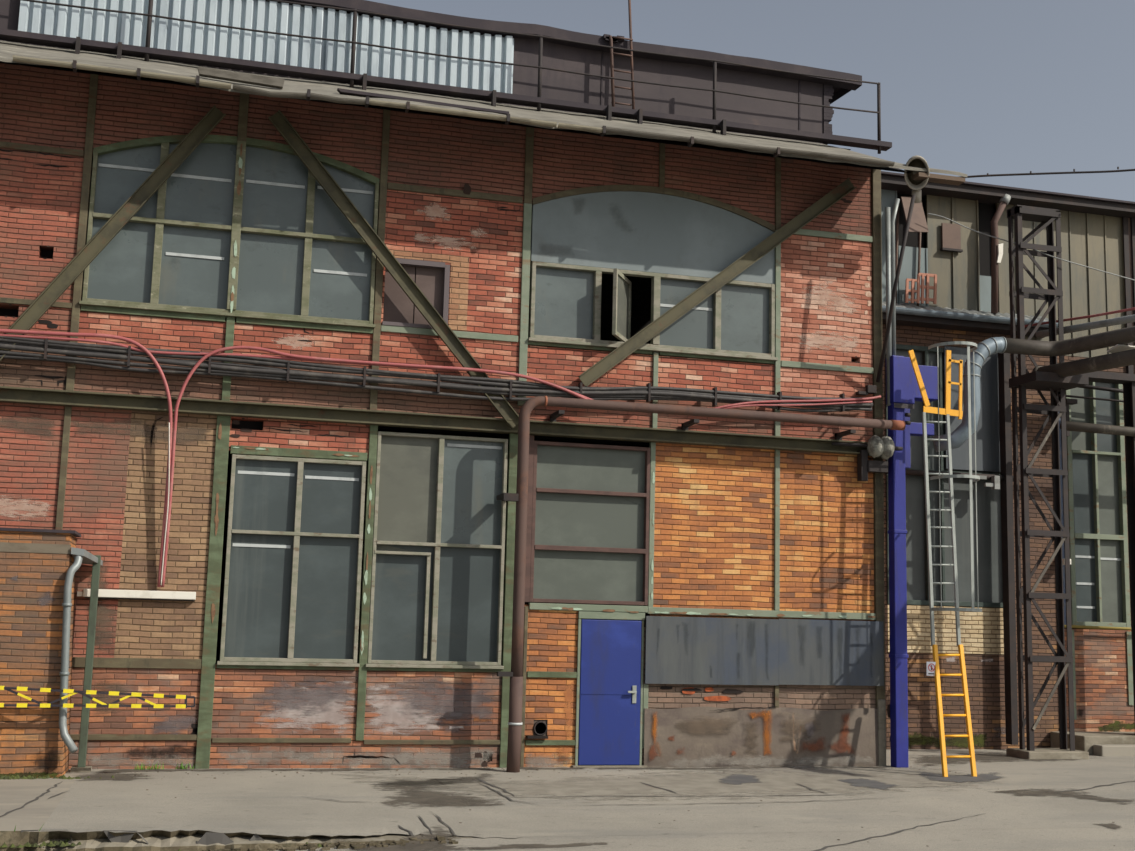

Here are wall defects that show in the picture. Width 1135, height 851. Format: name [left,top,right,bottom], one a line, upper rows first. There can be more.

leakage [256,680,354,728]
leakage [368,681,492,734]
corrosion [732,711,771,755]
leakage [229,749,502,807]
crack [607,782,697,805]
crack [737,783,915,803]
leakage [337,827,607,851]
crack [813,813,986,851]